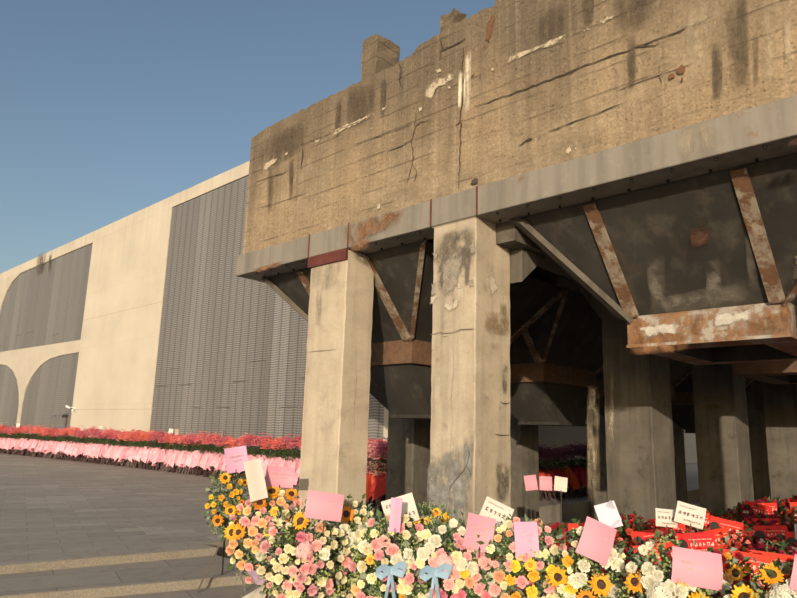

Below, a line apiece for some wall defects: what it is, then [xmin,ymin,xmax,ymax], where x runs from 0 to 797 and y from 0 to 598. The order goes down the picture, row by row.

peeling [508,35,563,62]
leakage [349,82,386,121]
spalling [425,69,454,99]
crack [440,16,712,188]
leakage [266,129,302,194]
crack [259,118,366,181]
crack [354,116,429,181]
corrosion [348,213,397,250]
peeling [431,241,476,311]
corrosion [634,320,684,353]
corrosion [743,305,789,336]